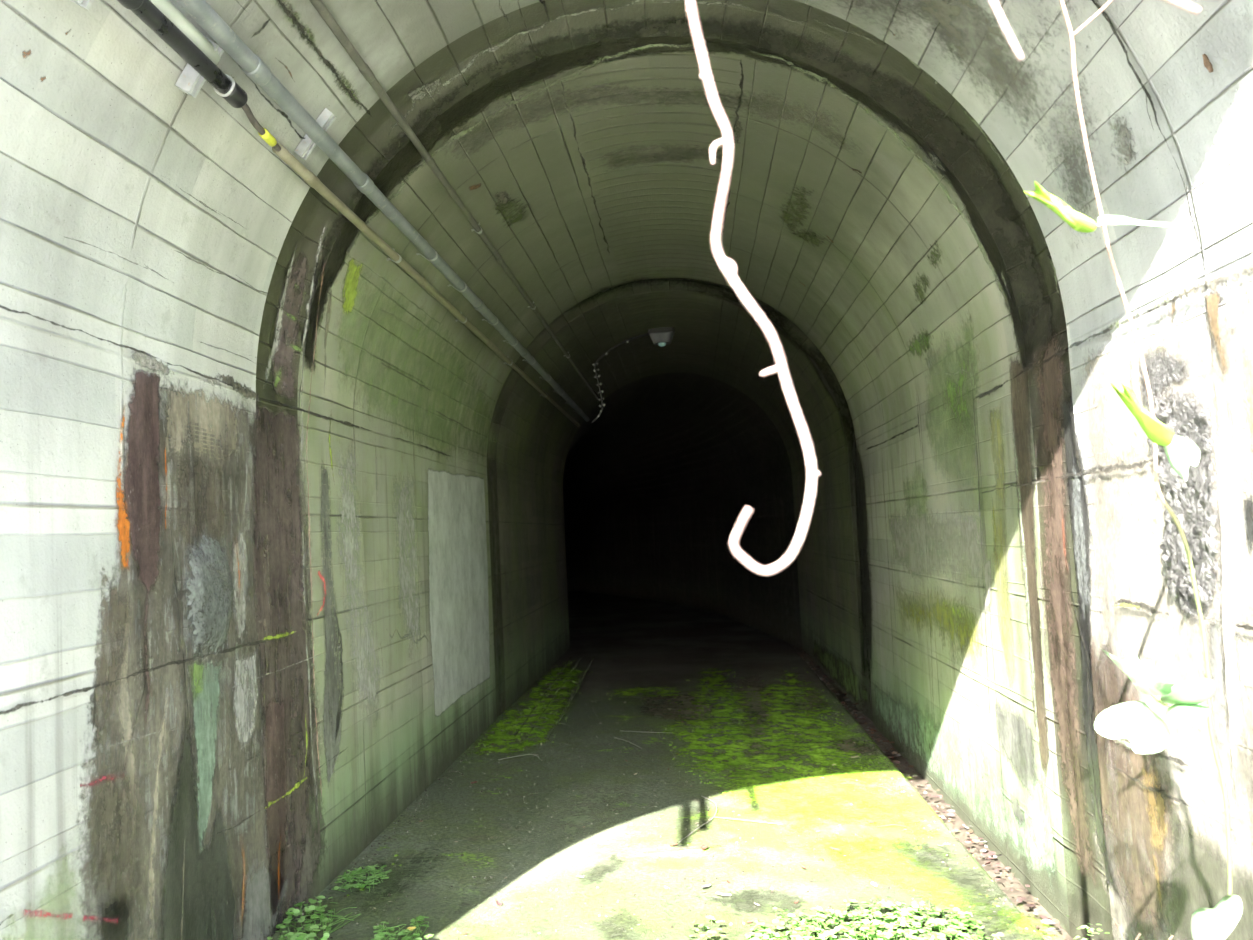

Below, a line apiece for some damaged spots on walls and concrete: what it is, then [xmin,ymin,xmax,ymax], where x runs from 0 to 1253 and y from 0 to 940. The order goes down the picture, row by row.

crack [561,81,610,253]
crack [720,177,731,241]
crack [732,62,743,143]
crack [1092,0,1203,260]
damp [78,0,1055,940]
crack [970,293,1253,900]
damp [1084,292,1253,940]